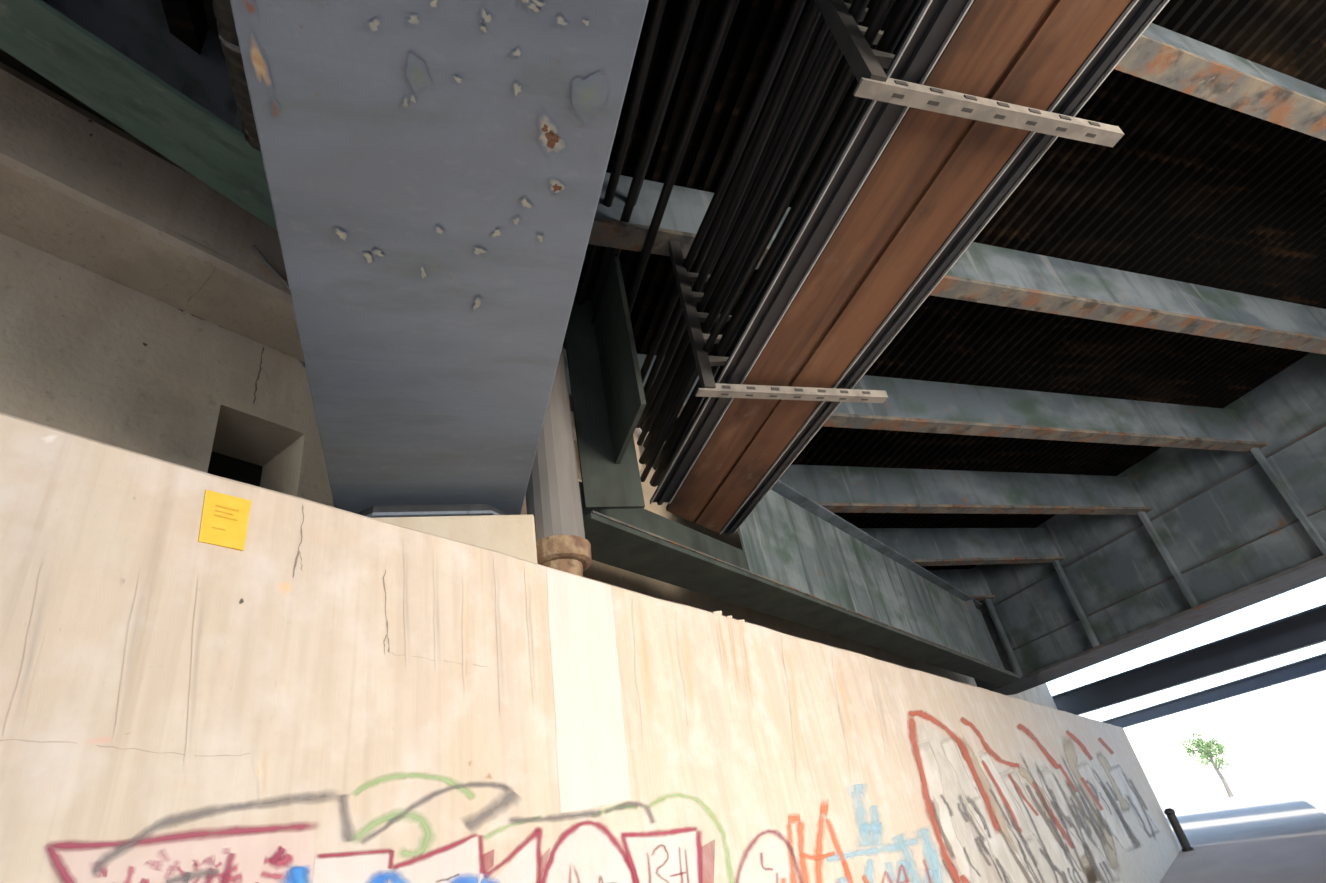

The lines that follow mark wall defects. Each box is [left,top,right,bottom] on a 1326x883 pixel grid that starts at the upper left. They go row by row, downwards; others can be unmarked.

peeling [520,0,590,27]
corrosion [536,111,568,157]
crack [253,345,270,405]
crack [292,503,304,579]